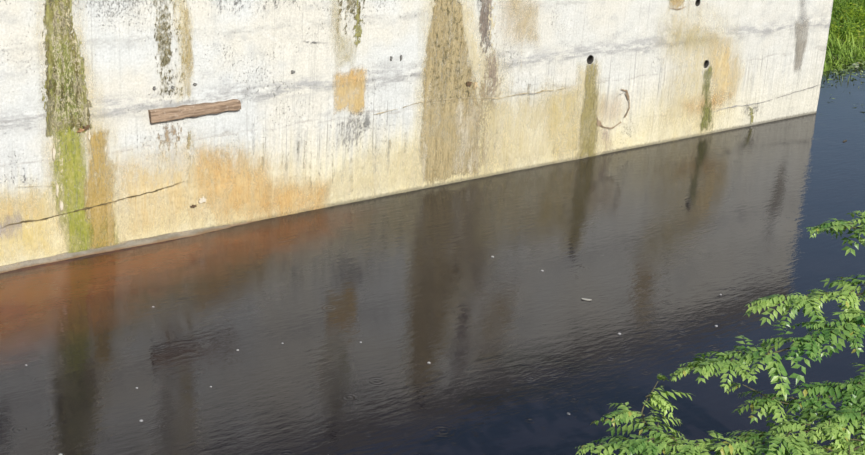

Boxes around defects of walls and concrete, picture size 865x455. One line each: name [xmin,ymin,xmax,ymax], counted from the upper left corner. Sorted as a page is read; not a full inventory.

water stain [0,0,118,260]
water stain [153,0,171,93]
rust [335,70,365,113]
water stain [345,0,598,192]
water stain [701,67,713,131]
crack [0,181,184,229]